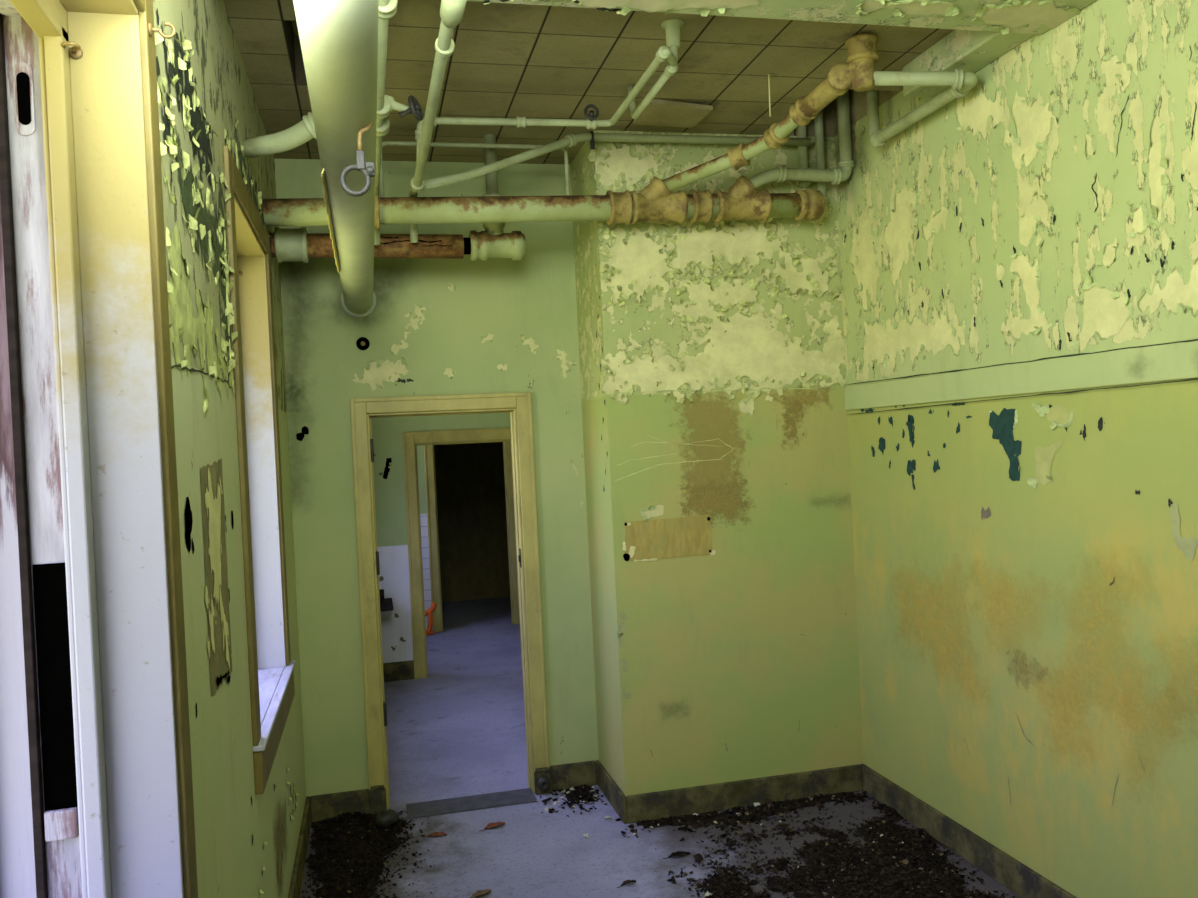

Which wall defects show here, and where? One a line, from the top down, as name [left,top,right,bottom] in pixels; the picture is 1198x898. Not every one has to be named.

peeling [564,0,759,17]
peeling [855,0,1081,35]
peeling [1101,54,1131,91]
peeling [954,89,1060,169]
peeling [155,8,268,417]
peeling [996,111,1198,354]
peeling [596,185,976,417]
peeling [353,303,426,391]
leakage [682,394,747,520]
peeling [861,402,972,490]
peeling [989,402,1105,489]
peeling [185,458,234,696]